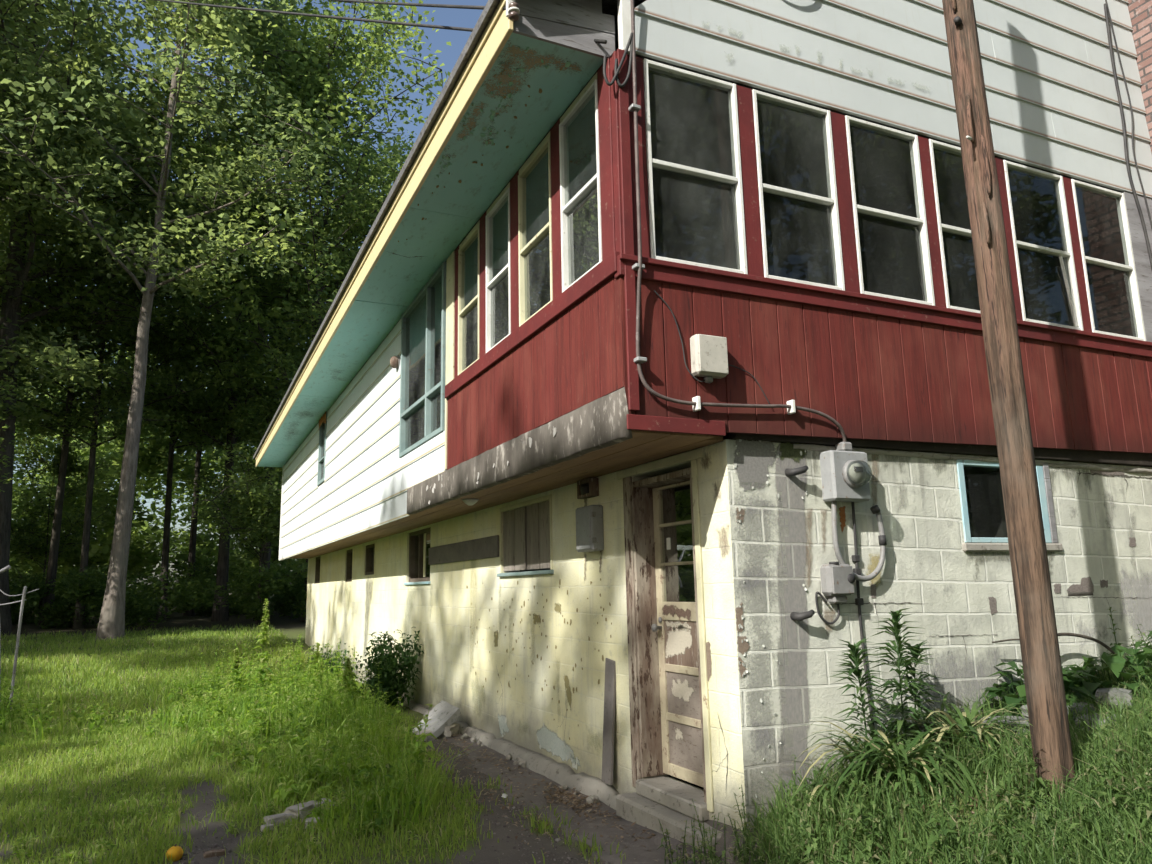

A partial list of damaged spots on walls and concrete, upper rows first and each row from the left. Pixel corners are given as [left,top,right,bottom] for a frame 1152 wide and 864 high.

peeling [458,43,581,166]
peeling [470,578,612,668]
peeling [734,439,809,801]
spalling [1054,577,1108,597]
water stain [1121,573,1152,634]
peeling [541,658,583,710]
peeling [536,719,580,770]